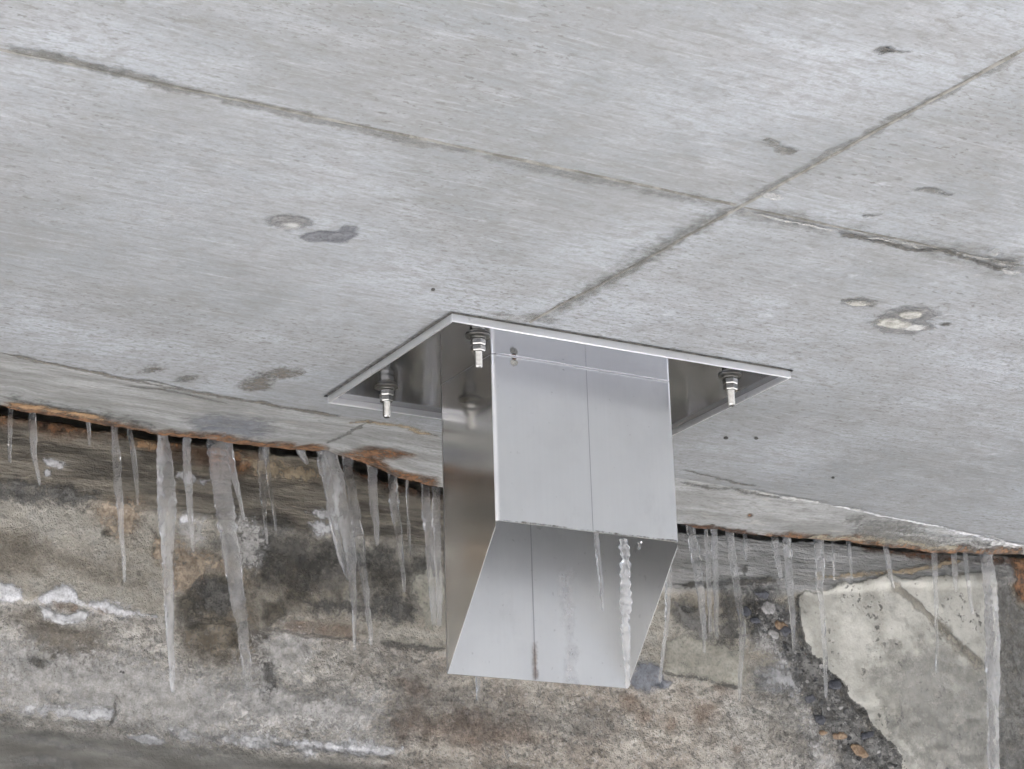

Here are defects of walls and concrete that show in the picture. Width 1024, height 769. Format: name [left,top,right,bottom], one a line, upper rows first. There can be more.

crack [918,188,951,196]
spalling [846,298,937,334]
corrosion [0,403,325,482]
corrosion [341,447,443,501]
corrosion [686,524,1024,603]
water stain [0,510,427,757]
spalling [671,582,907,769]